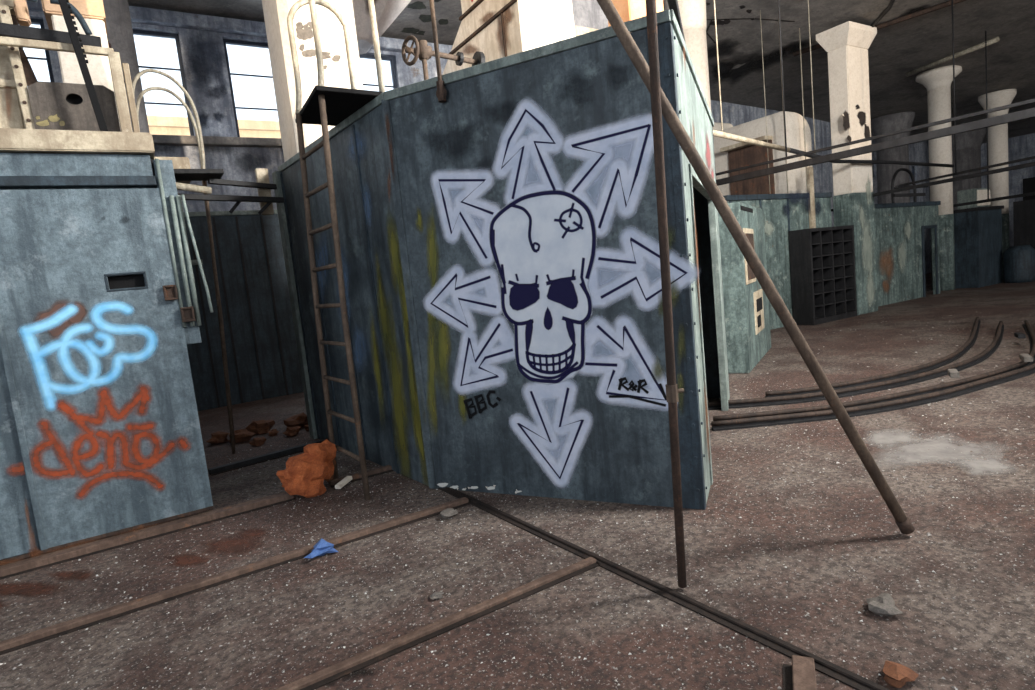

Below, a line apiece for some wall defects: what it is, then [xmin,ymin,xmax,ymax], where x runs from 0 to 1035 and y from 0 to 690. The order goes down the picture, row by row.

peeling [296,22,341,69]
peeling [842,105,870,142]
leakage [417,212,438,290]
leakage [371,226,449,475]